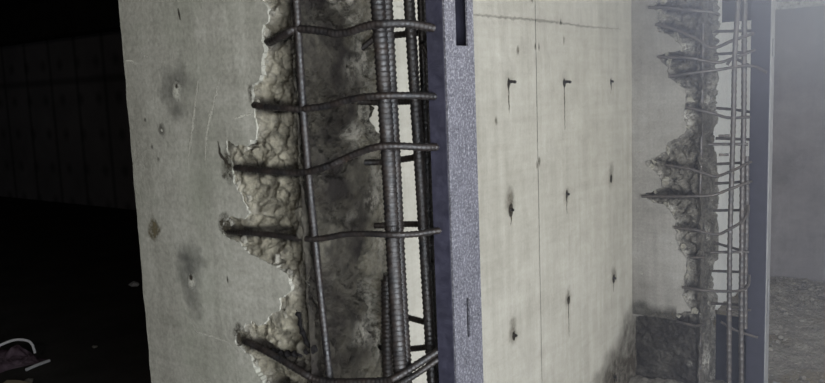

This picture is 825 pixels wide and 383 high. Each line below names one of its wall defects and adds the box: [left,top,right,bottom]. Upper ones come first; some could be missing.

spalling [223,0,442,383]
spalling [636,0,768,383]